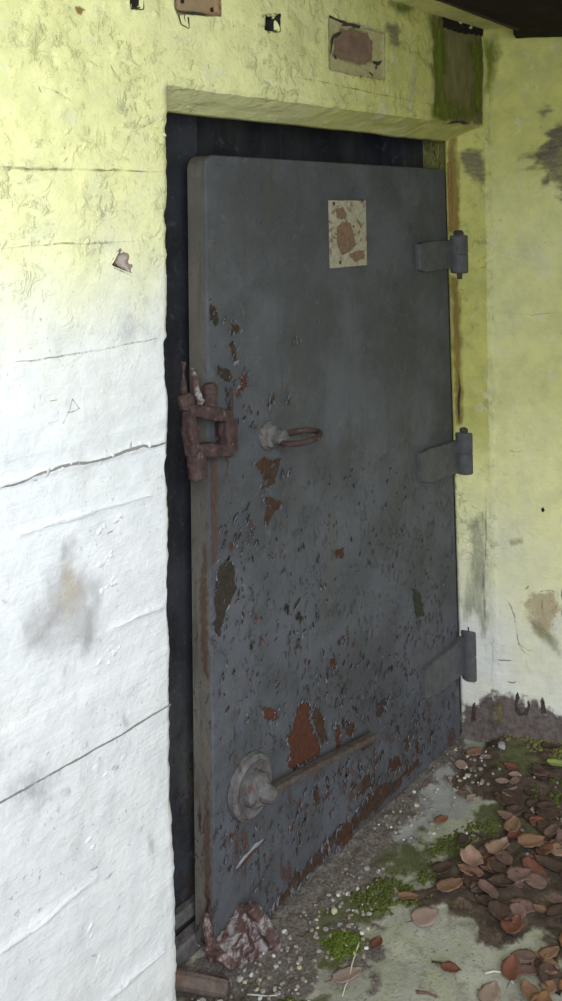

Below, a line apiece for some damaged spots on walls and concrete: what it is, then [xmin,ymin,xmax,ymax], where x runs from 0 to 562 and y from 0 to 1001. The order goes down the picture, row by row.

spalling [328,15,385,79]
water stain [432,22,483,120]
water stain [530,127,562,188]
spalling [110,248,133,276]
crack [2,441,167,488]
peeling [212,502,337,723]
peeling [350,528,425,639]
crack [0,704,171,804]
rust [286,696,357,771]
peeling [304,635,453,818]
water stain [459,692,562,743]
rust [267,735,424,918]